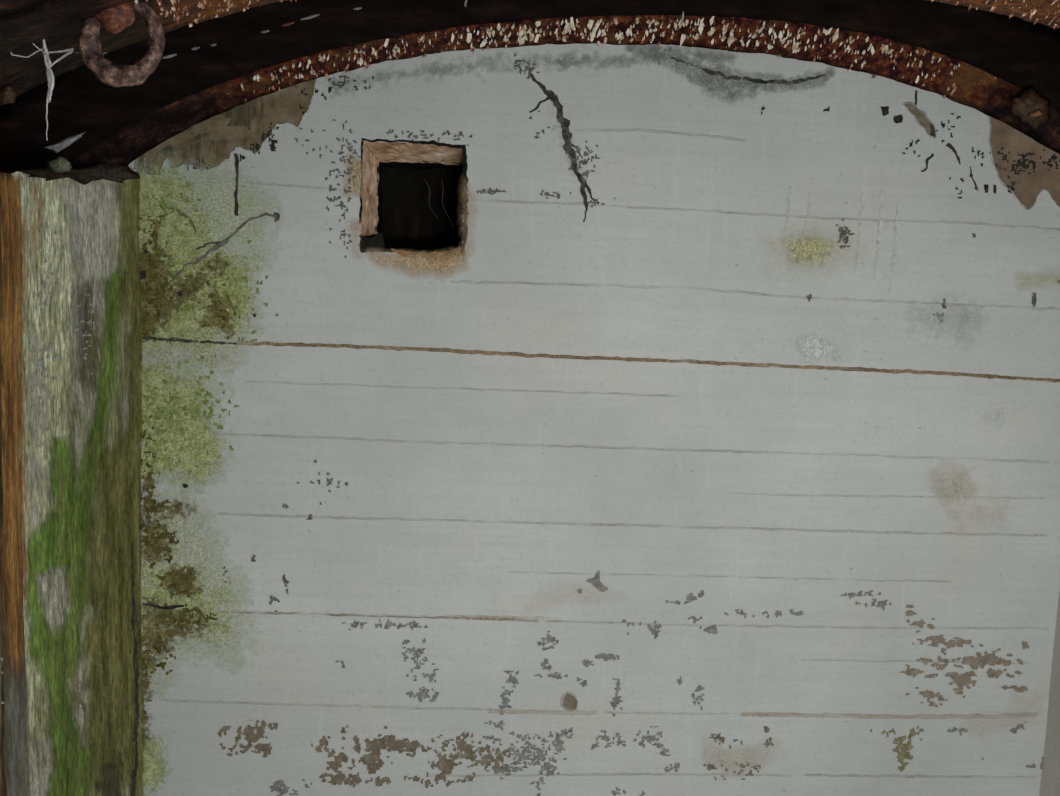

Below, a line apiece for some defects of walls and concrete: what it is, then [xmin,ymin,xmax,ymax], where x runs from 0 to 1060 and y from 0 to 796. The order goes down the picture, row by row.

flaking render [134,54,374,175]
peeling [348,39,408,66]
water stain [514,52,540,79]
crack [526,65,600,222]
water stain [566,141,600,182]
peeling [451,16,941,139]
flaking render [988,116,1060,211]
water stain [142,337,236,345]
peeling [270,671,574,796]
peeling [535,631,620,711]
peeling [610,678,623,717]
peeling [900,605,1029,708]